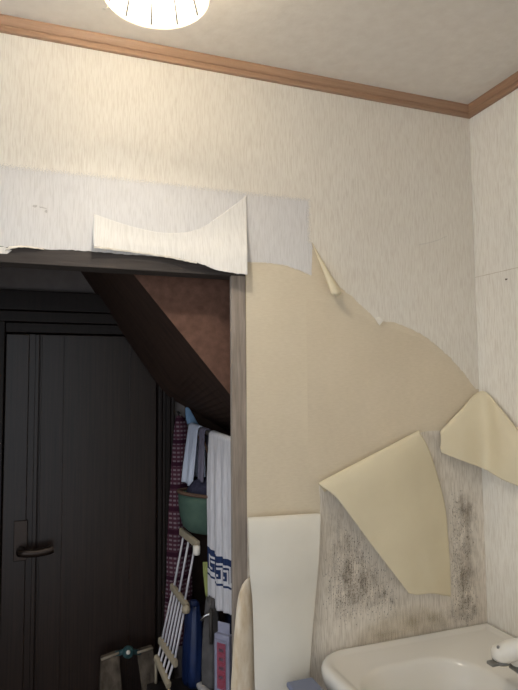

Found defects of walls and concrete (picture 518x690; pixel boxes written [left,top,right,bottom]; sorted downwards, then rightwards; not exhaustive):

peeling [246,243,479,517]